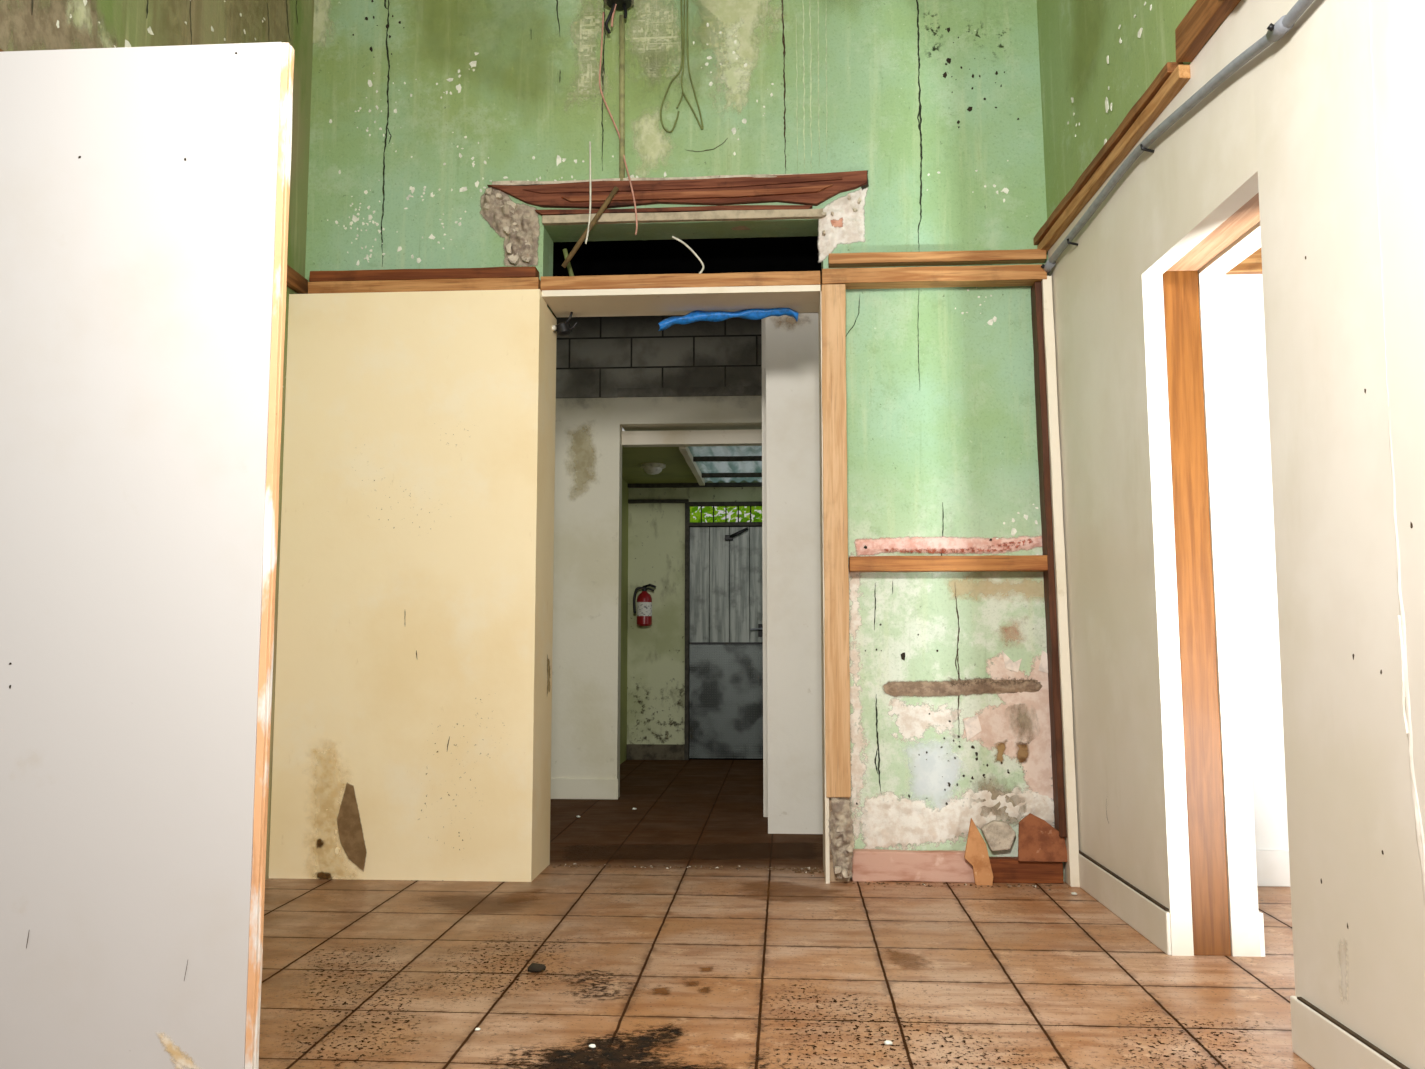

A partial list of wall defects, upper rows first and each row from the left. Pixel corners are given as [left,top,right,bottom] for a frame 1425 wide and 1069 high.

crack [381,0,391,265]
spalling [436,52,479,99]
spalling [404,132,540,267]
spalling [818,170,869,262]
flaking render [829,504,1054,882]
peeling [327,783,367,870]